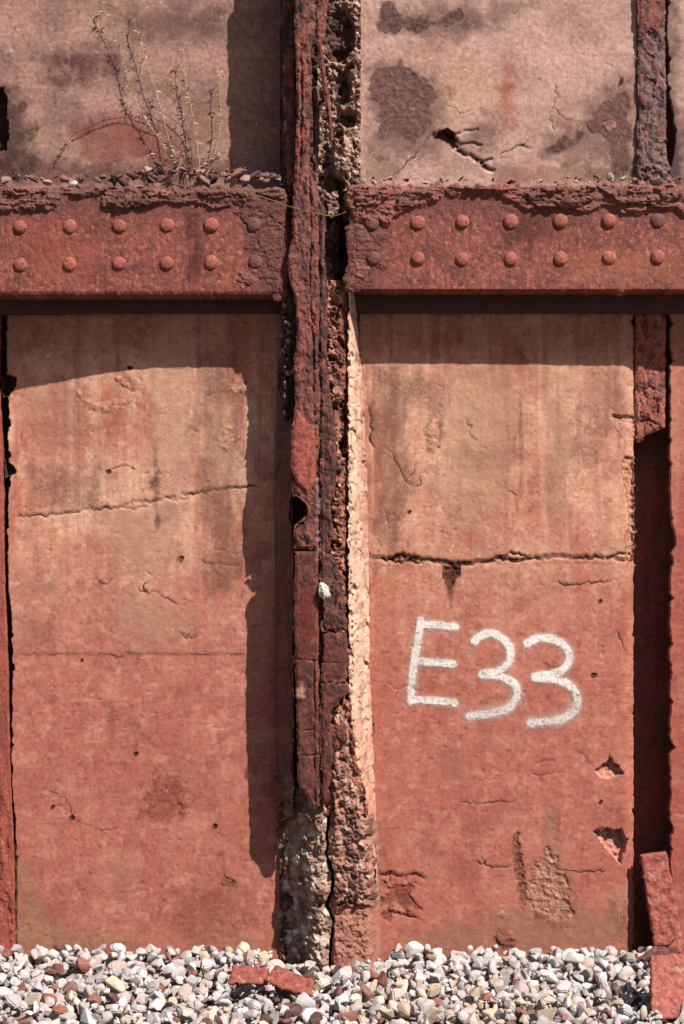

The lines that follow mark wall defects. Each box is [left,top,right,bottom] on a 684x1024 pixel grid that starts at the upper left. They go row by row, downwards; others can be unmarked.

crack [393,104,527,177]
corrosion [0,184,290,301]
corrosion [343,181,684,293]
crack [19,484,256,517]
spalling [276,0,464,976]
crack [374,552,631,586]
spalling [594,756,624,780]
spalling [512,833,574,920]
spalling [593,826,628,865]